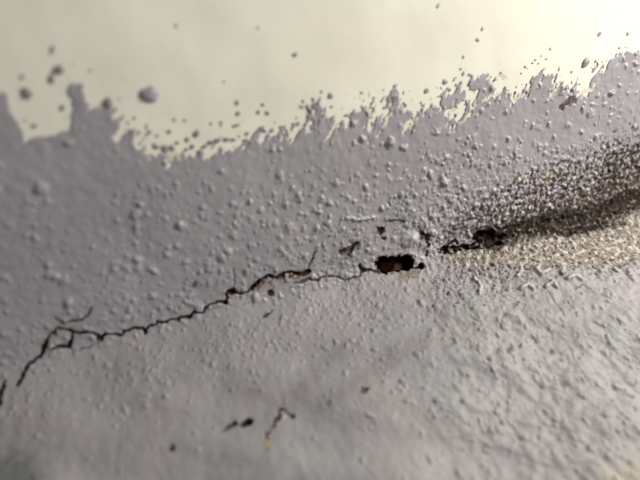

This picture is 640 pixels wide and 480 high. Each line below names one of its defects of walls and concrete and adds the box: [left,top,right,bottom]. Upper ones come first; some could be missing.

peeling [457,93,499,124]
spalling [358,254,426,279]
flaking render [417,201,640,294]
water stain [485,188,640,252]
crack [0,251,361,405]